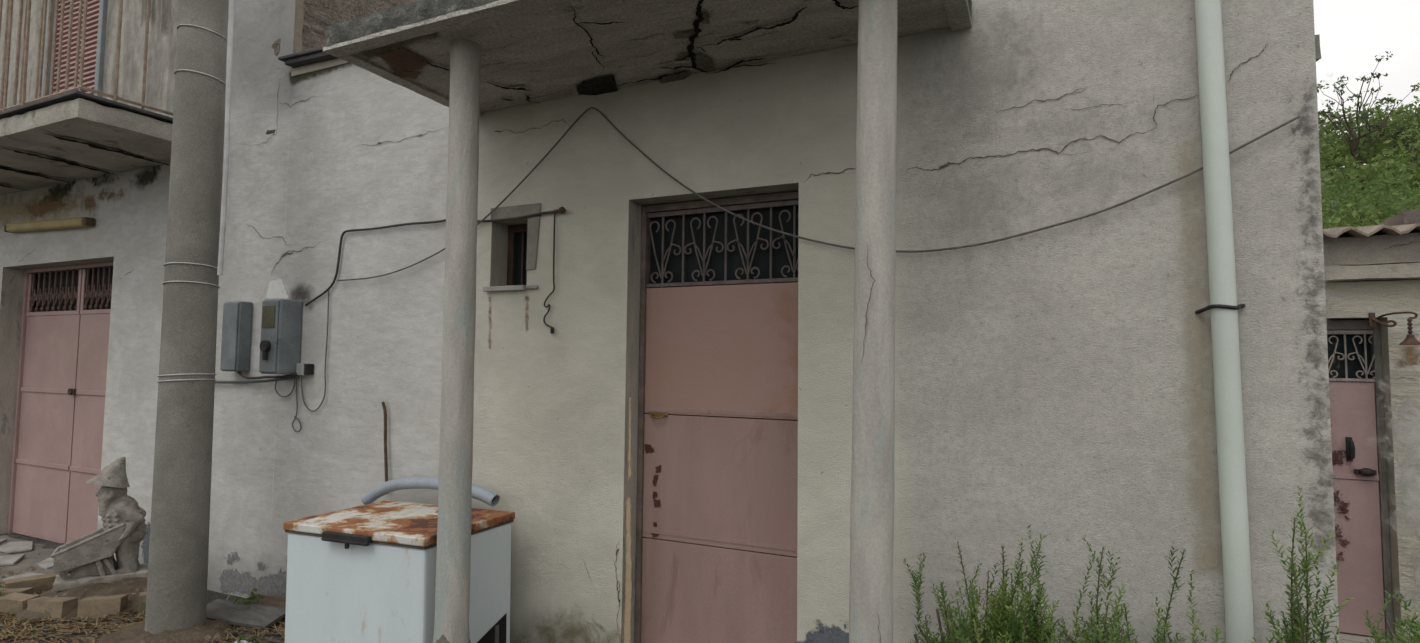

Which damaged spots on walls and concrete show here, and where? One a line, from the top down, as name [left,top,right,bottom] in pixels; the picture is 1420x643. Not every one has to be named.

spalling [359,32,438,79]
crack [571,0,859,86]
crack [1228,44,1267,81]
crack [910,86,1196,171]
rust [644,444,661,537]
rust [1332,450,1348,467]
rust [1334,490,1350,563]